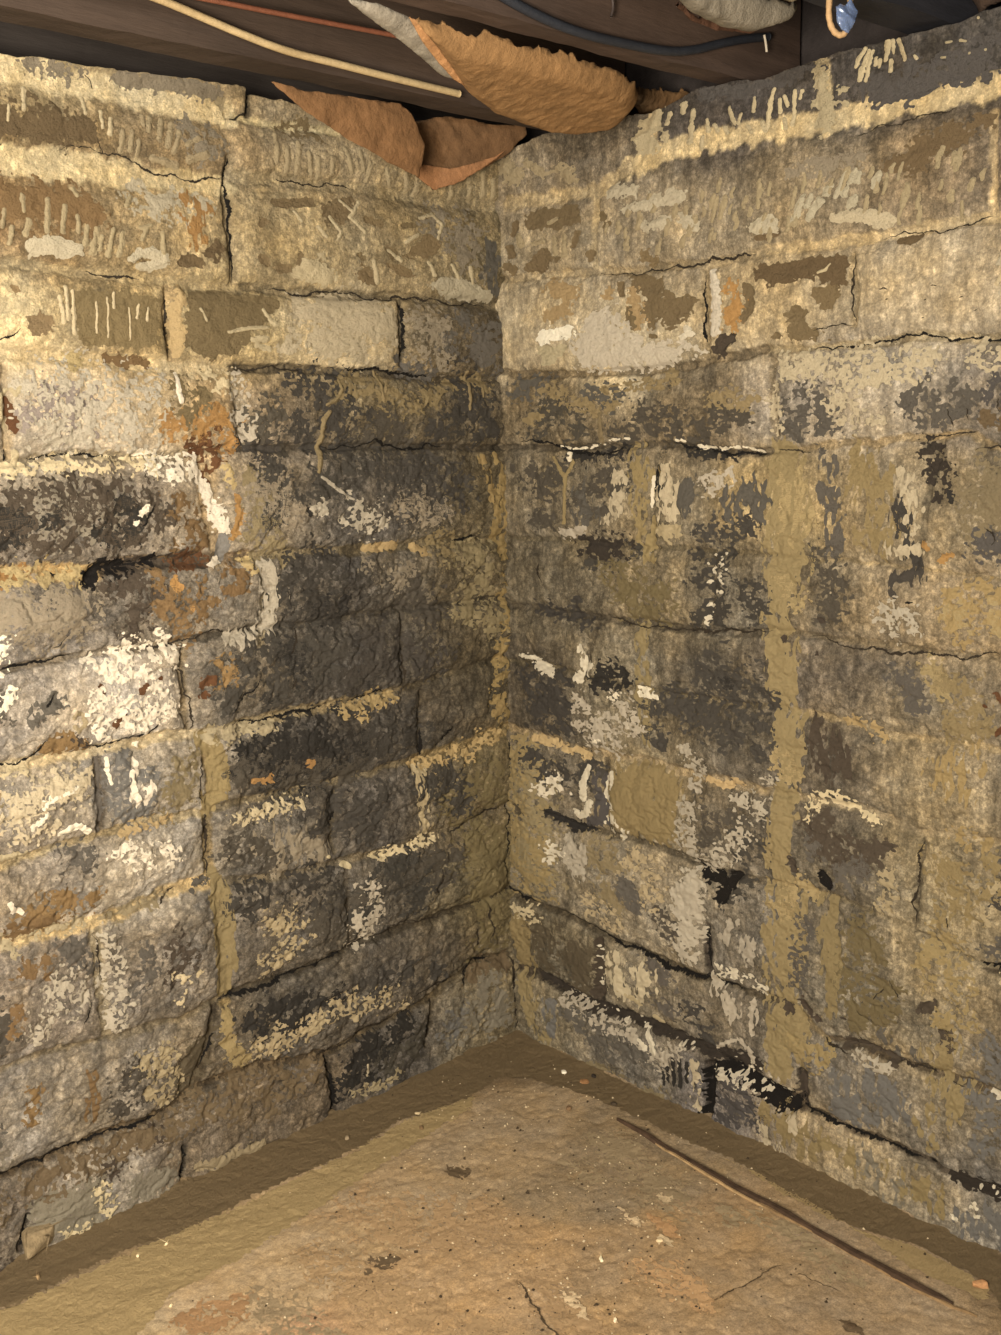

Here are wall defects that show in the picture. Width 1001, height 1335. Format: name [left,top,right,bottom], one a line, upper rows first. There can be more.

crack [229,89,248,121]
crack [61,139,233,286]
crack [276,179,349,189]
leakage [411,196,501,298]
crack [85,271,169,354]
crack [236,364,305,372]
crack [265,288,486,378]
corrosion [158,401,246,486]
crack [521,439,624,456]
crack [676,442,811,457]
leakage [0,300,1001,1335]
crack [518,1281,558,1335]